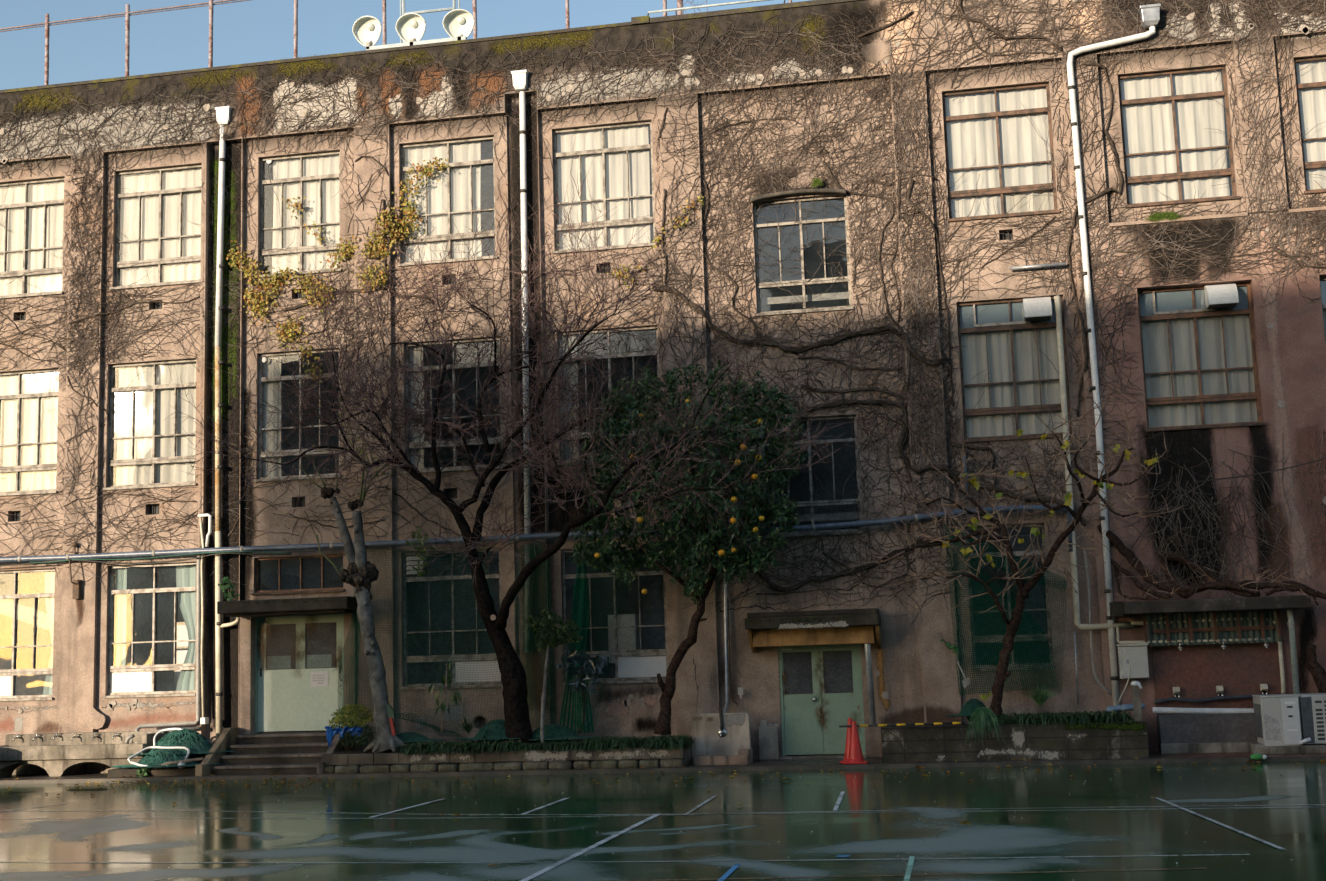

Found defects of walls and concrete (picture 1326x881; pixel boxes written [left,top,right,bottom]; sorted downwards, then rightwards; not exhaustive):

flaking render [273,76,365,132]
flaking render [388,76,453,118]
water stain [1127,217,1239,281]
water stain [1140,428,1227,586]